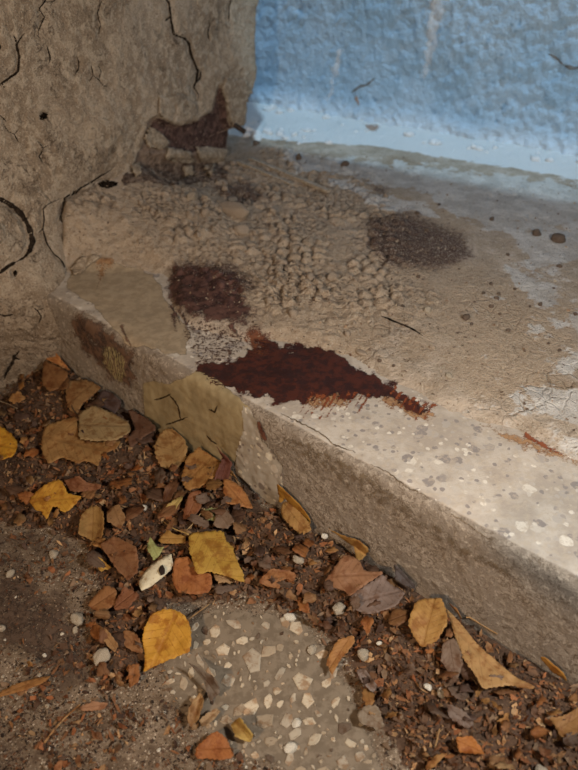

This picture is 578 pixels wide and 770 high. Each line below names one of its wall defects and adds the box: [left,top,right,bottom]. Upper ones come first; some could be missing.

crack [0,0,55,88]
crack [165,0,232,102]
flaking render [121,78,253,186]
crack [0,164,117,274]
water stain [71,310,138,395]
corrosion [241,326,270,357]
crack [382,316,423,336]